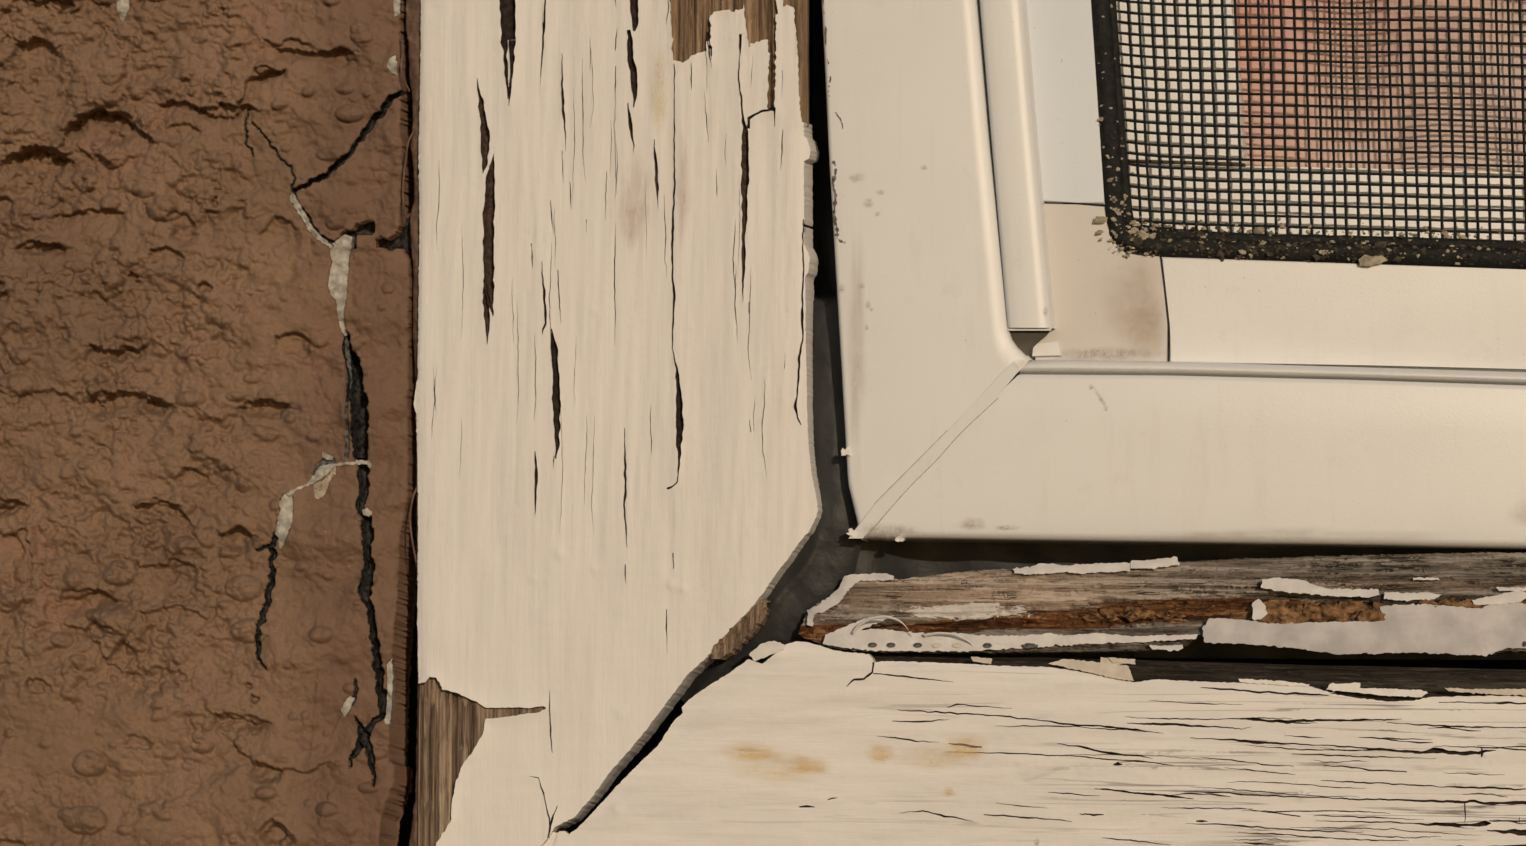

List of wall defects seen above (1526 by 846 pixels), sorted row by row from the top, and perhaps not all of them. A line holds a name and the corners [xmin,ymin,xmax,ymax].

peeling [670,0,809,127]
crack [244,0,845,786]
peeling [1013,556,1180,575]
peeling [807,573,1526,681]
peeling [418,677,546,846]
crack [847,662,1526,846]